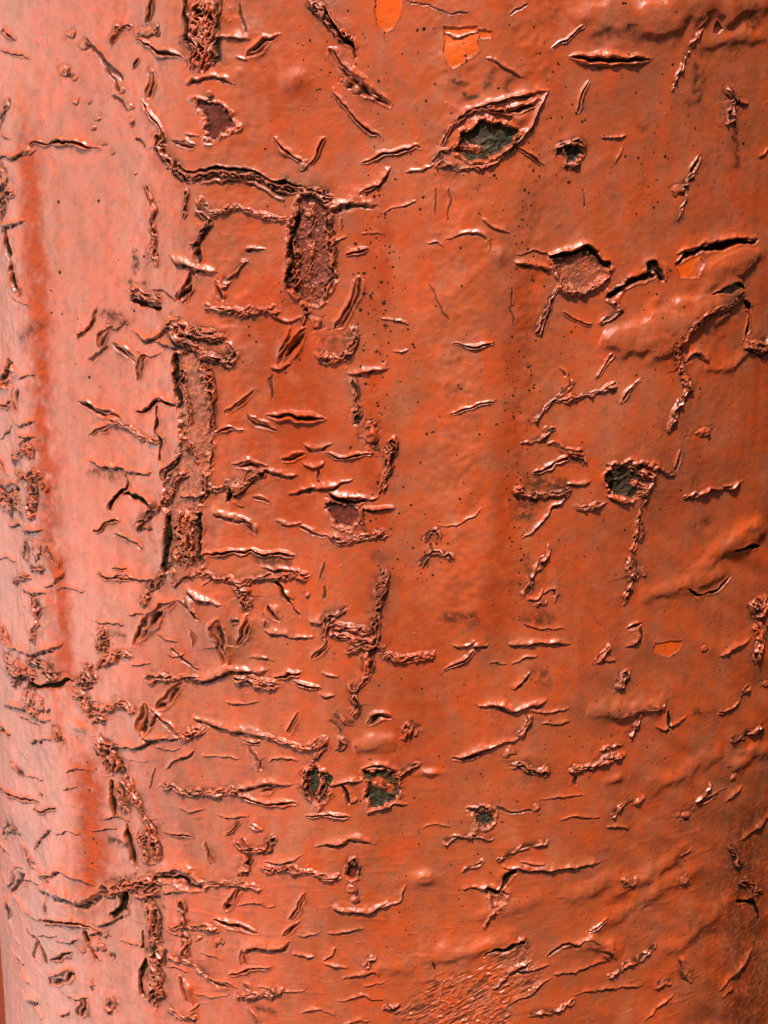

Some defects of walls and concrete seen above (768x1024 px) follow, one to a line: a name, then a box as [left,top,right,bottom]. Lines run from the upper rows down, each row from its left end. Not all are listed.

peeling [161,0,252,149]
peeling [441,24,495,71]
peeling [405,85,591,180]
crack [56,25,340,376]
peeling [278,195,345,309]
peeling [545,237,616,304]
peeling [104,348,225,579]
peeling [321,432,405,533]
peeling [601,453,661,507]
crack [226,523,460,806]
peeling [263,724,338,813]
peeling [357,758,410,817]